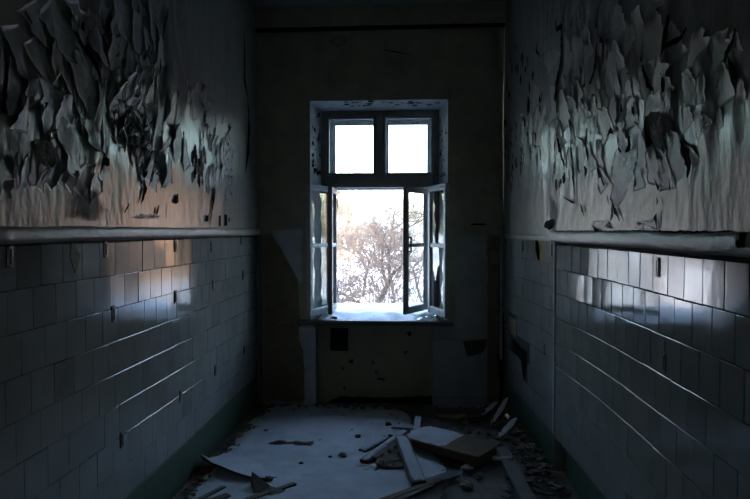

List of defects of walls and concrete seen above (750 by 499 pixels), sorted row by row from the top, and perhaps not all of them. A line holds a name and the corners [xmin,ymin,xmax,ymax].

peeling [0,0,235,201]
crack [242,28,250,172]
peeling [504,0,747,221]